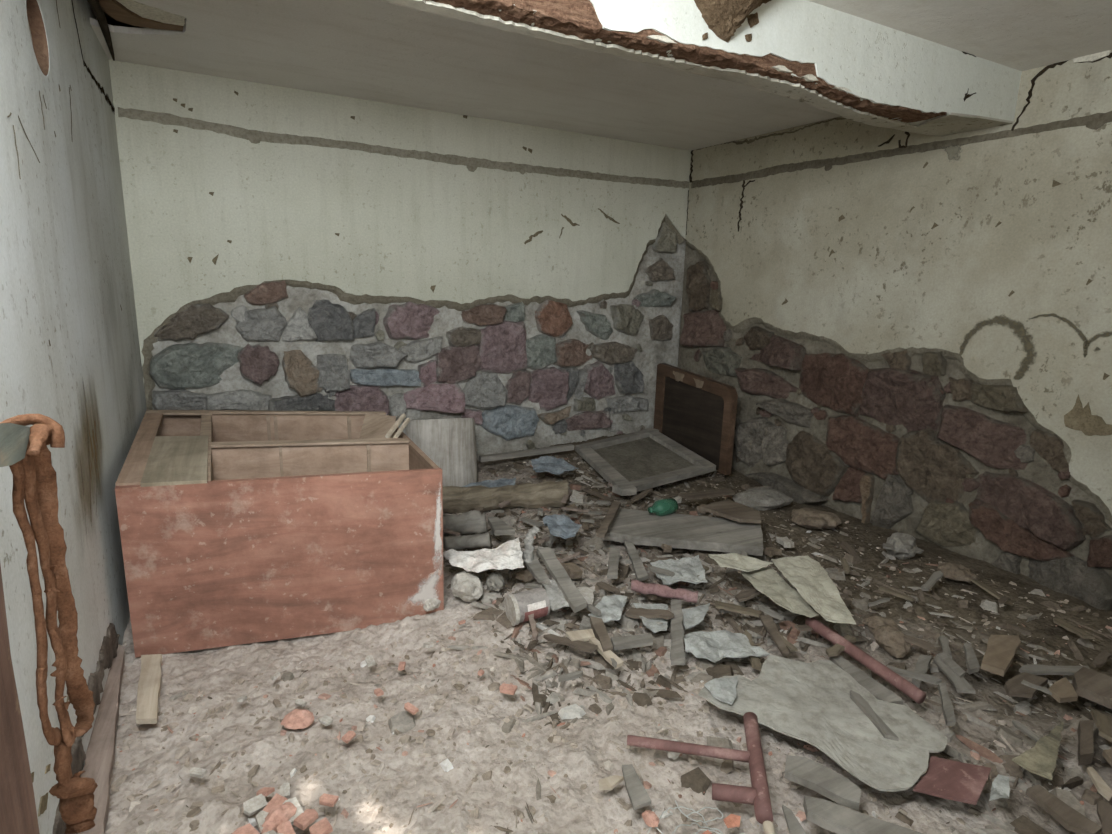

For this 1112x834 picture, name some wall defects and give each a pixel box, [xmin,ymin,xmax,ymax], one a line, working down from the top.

crack [7,0,115,179]
spalling [87,0,185,61]
spalling [426,0,947,123]
crack [1011,53,1112,131]
flaking render [141,214,1013,410]
water stain [78,384,101,533]
flaking render [1021,394,1112,526]
flaking render [88,623,120,715]
flaking render [38,792,67,834]
flaking render [71,735,86,777]